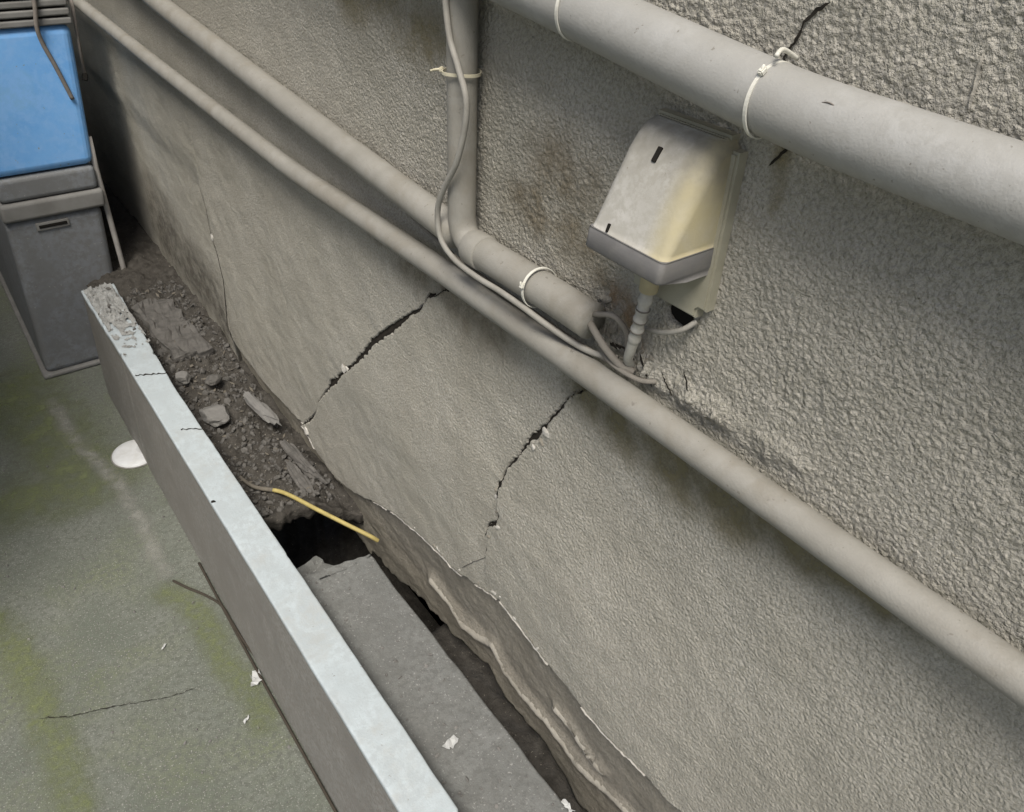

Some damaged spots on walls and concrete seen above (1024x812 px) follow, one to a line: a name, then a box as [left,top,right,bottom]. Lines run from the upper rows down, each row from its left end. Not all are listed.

crack [783,2,831,61]
crack [769,149,788,166]
crack [302,289,449,435]
crack [462,390,585,568]